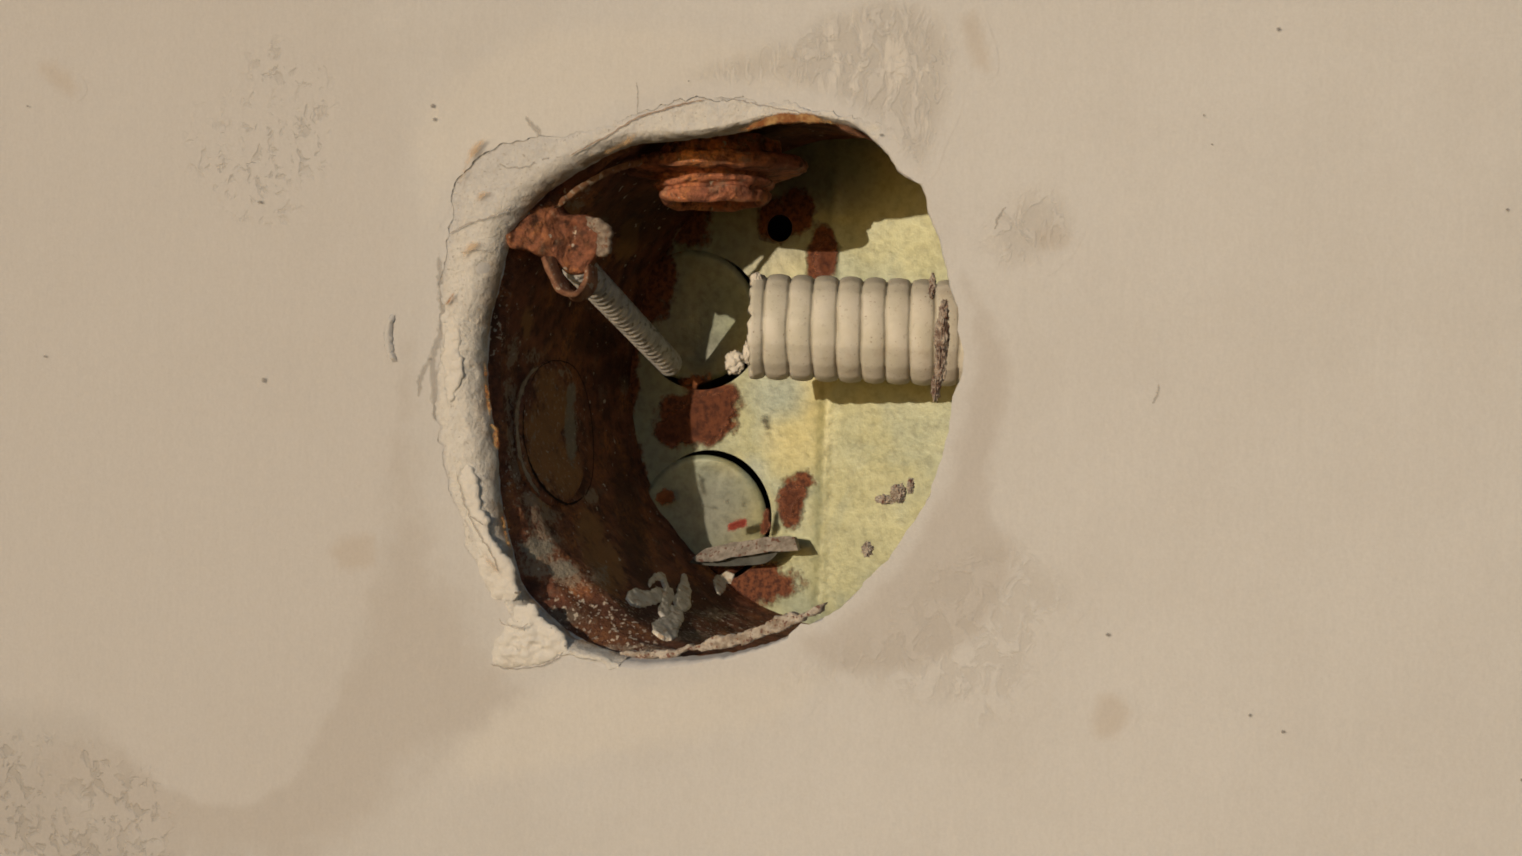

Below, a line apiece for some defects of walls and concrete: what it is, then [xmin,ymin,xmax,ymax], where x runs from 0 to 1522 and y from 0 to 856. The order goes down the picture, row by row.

rust [746,112,862,138]
rust [484,372,499,447]
spalling [0,718,191,856]